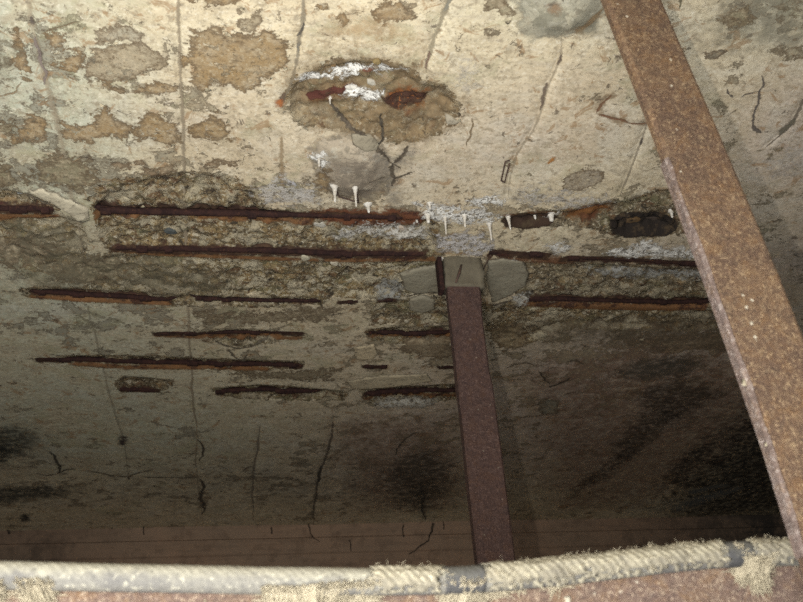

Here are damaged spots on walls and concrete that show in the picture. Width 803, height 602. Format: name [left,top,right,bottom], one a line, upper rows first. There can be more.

spalling [43,0,463,145]
crack [726,77,765,133]
damp [307,151,375,194]
spalling [0,104,453,369]
rust [198,208,425,227]
damp [332,182,615,257]
rust [563,204,611,225]
spalling [499,188,685,239]
rust [30,294,171,306]
rust [523,300,708,311]
spalling [35,354,457,407]
damp [368,396,438,410]